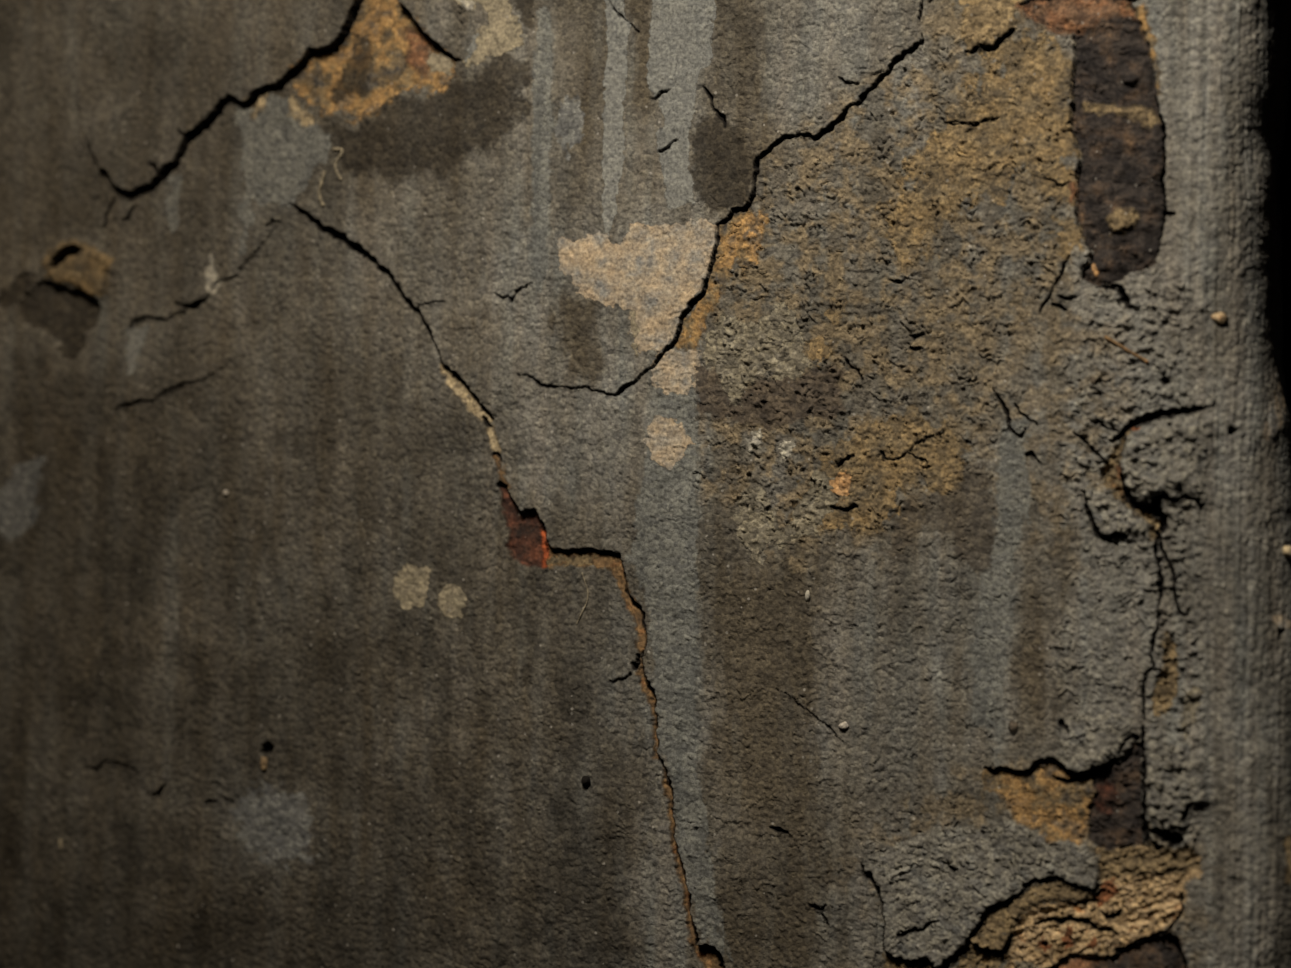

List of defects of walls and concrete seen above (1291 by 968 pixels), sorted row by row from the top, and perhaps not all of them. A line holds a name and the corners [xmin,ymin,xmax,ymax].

spalling [0,239,114,361]
crack [93,0,364,228]
spalling [291,0,455,124]
crack [519,0,932,396]
crack [1040,256,1134,313]
spalling [1017,0,1165,286]
leakage [393,563,469,618]
crack [266,204,724,966]
leakage [455,0,848,954]
crack [985,401,1216,849]
crack [862,864,1188,968]
spalling [862,742,1203,968]